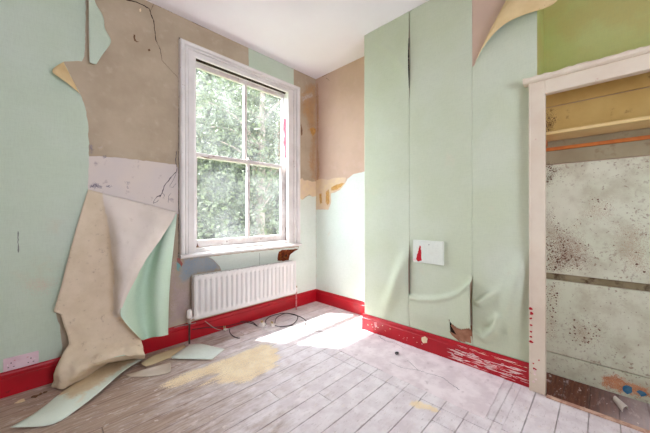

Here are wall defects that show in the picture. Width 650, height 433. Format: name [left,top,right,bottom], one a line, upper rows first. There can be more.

peeling [88,0,111,64]
crack [126,0,170,69]
peeling [474,0,558,66]
peeling [52,62,80,94]
crack [153,143,179,254]
peeling [120,214,183,340]
flaking render [277,249,298,261]
mould [546,194,650,340]
peeling [449,320,540,383]
peeling [601,374,650,398]